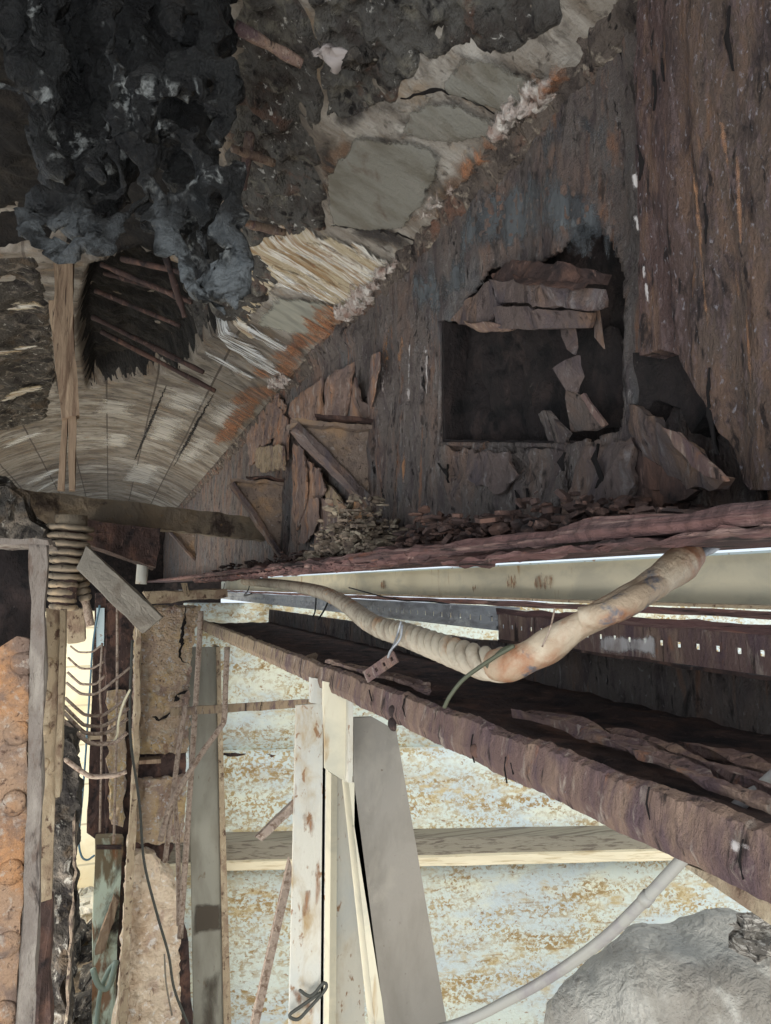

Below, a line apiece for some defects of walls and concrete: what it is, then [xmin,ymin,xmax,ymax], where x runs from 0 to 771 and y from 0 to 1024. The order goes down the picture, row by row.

crack [400,88,495,114]
spalling [79,0,563,393]
corrosion [215,305,403,545]
crack [178,607,187,663]
corrosion [325,659,431,695]
crack [153,690,188,721]
corrosion [511,709,771,815]
corrosion [304,866,320,915]